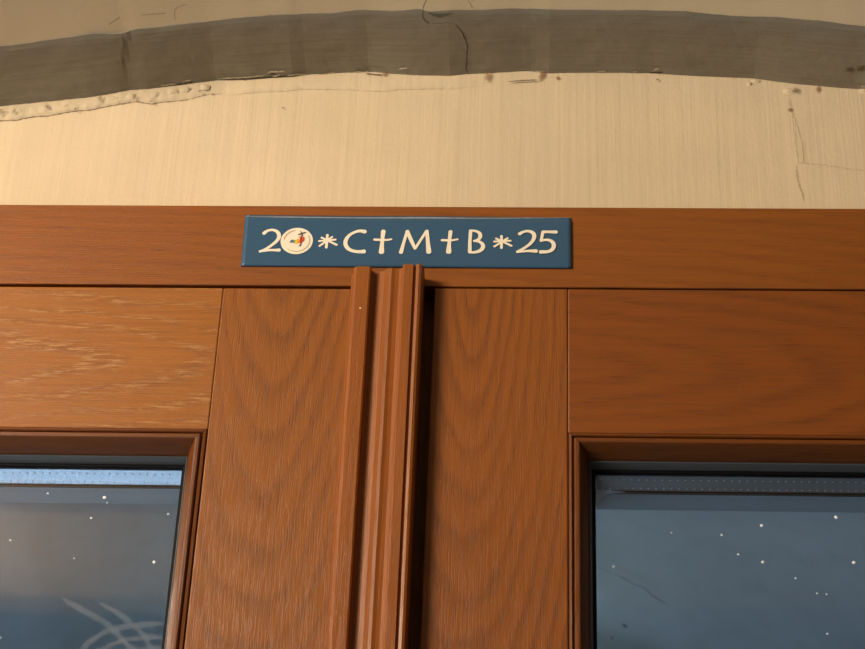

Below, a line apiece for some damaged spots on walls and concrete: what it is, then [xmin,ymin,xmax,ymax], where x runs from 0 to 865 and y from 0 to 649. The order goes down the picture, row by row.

crack [422,1,469,75]
flaking render [0,71,306,121]